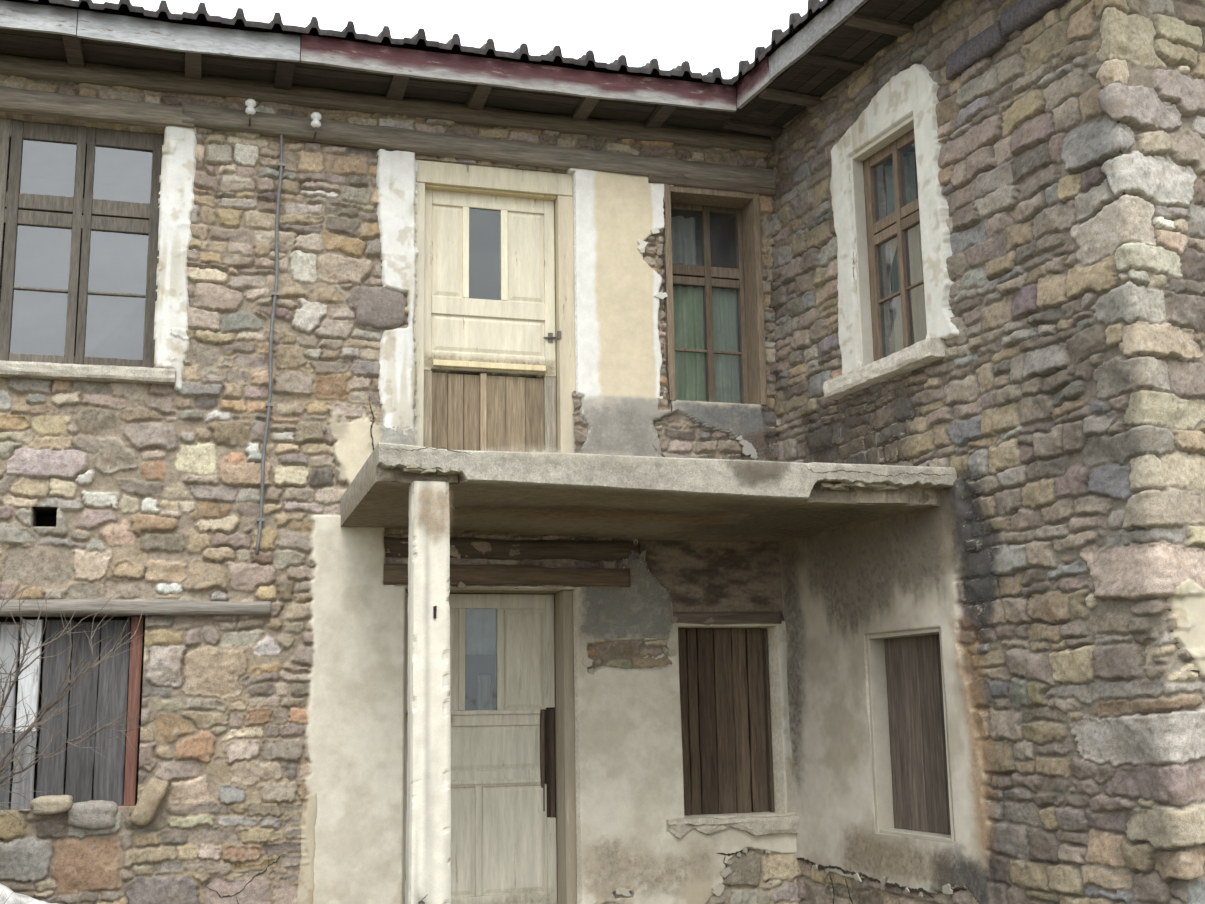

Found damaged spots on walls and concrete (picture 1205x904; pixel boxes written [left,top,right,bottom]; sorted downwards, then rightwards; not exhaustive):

flaking render [637,227,758,460]
damp [580,408,691,465]
damp [685,403,788,483]
flaking render [384,528,409,564]
flaking render [450,530,784,626]
damp [785,474,1000,765]
flaking render [582,639,677,675]
flaking render [593,887,634,904]
flaking render [706,848,979,904]